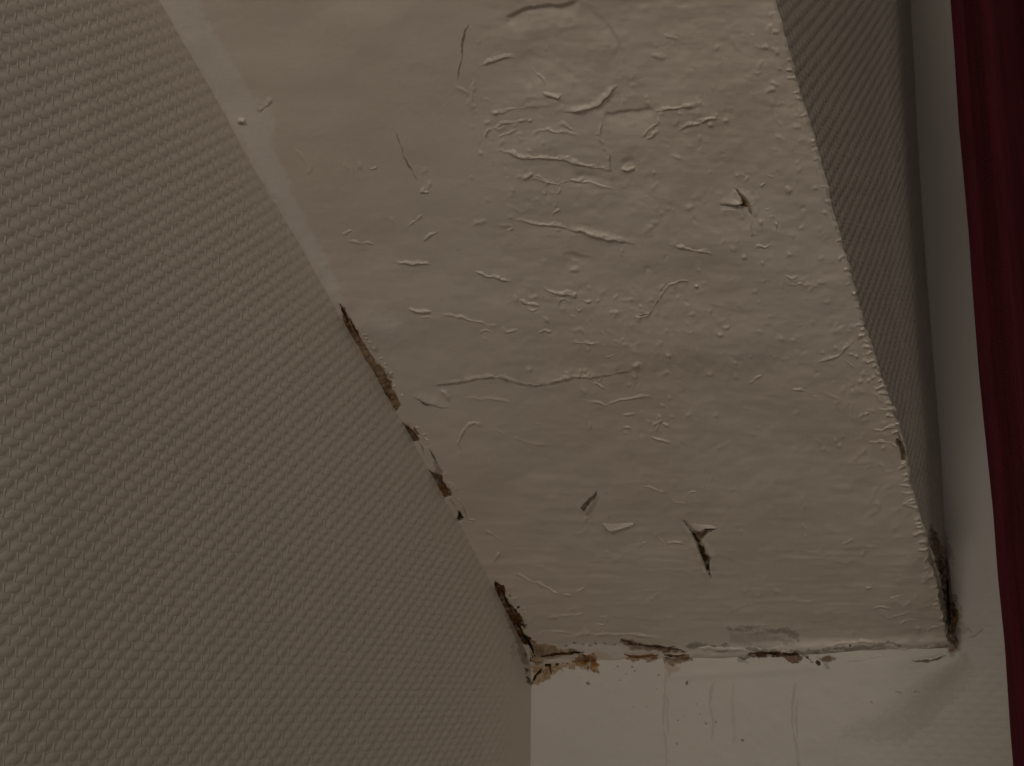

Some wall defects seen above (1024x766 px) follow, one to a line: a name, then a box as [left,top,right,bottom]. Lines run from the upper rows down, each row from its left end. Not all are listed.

spalling [528,629,693,686]
spalling [737,649,836,669]